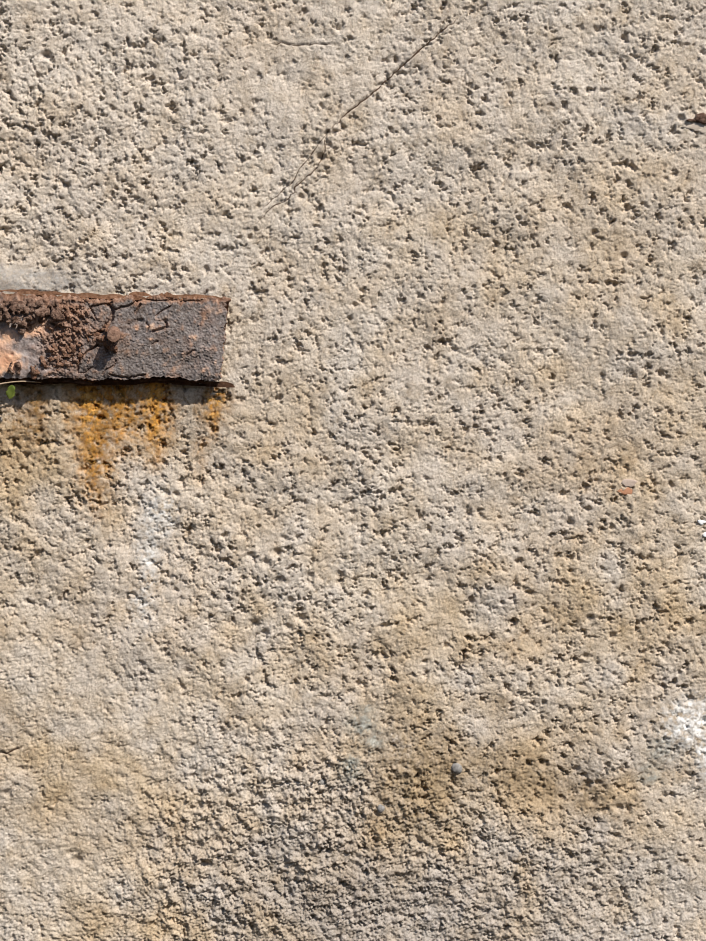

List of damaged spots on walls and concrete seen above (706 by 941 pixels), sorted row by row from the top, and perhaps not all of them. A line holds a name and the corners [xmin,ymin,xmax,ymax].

rust [0,289,235,476]